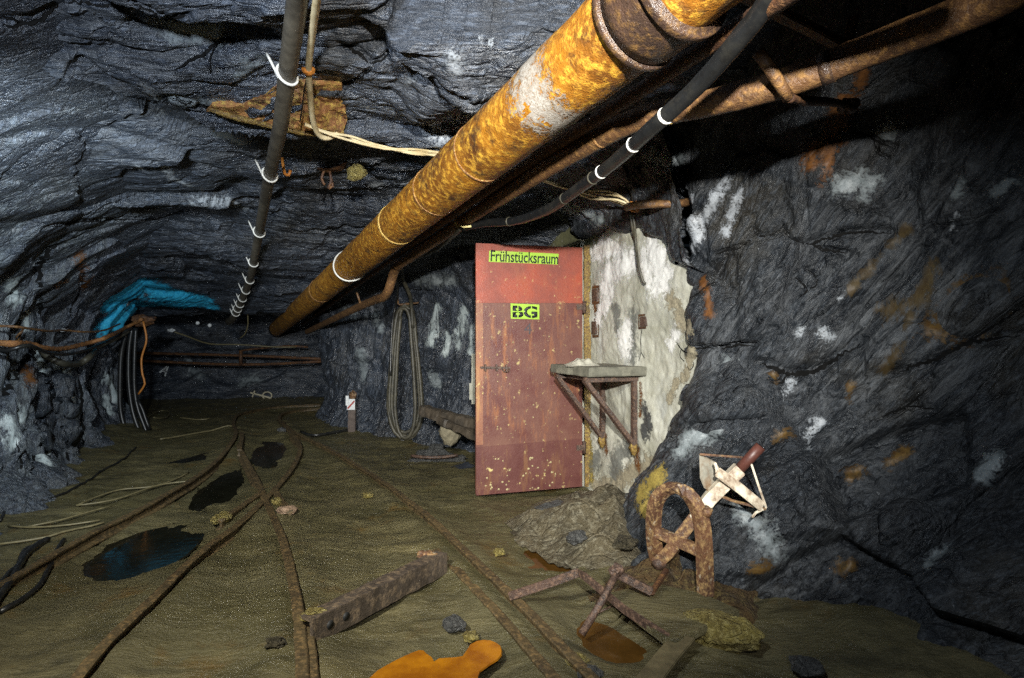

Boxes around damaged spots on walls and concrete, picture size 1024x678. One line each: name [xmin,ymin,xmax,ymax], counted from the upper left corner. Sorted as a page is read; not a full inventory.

damp [546,168,743,366]
damp [671,429,723,457]
damp [733,499,786,574]